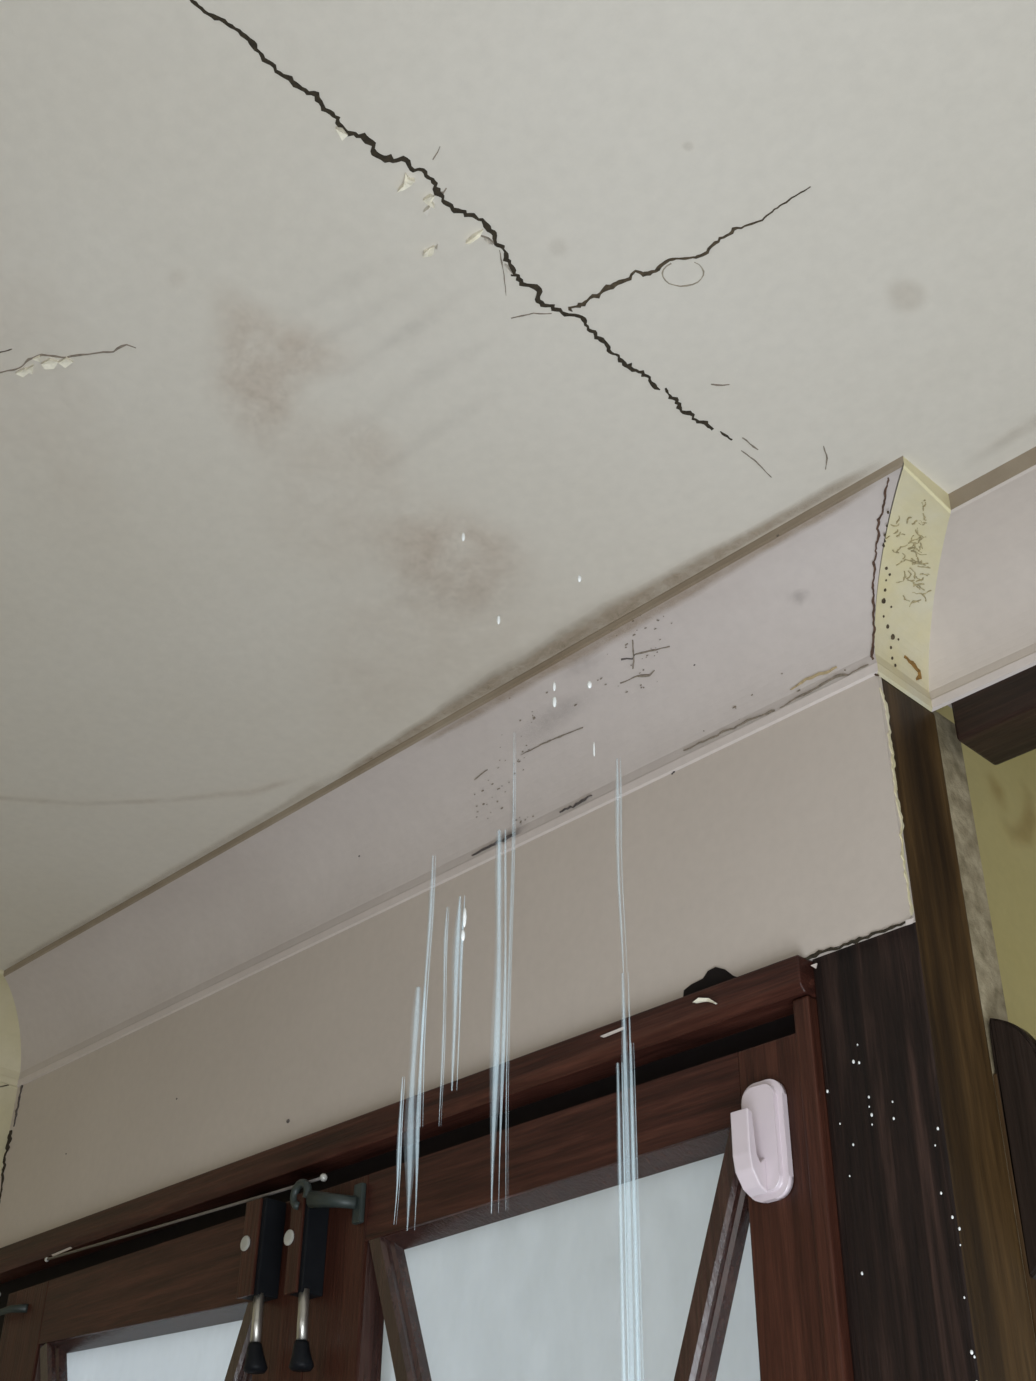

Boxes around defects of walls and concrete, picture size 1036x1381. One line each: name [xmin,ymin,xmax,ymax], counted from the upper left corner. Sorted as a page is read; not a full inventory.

crack [190,0,810,477]
crack [0,344,136,377]
spalling [882,567,899,667]
crack [0,1085,23,1199]